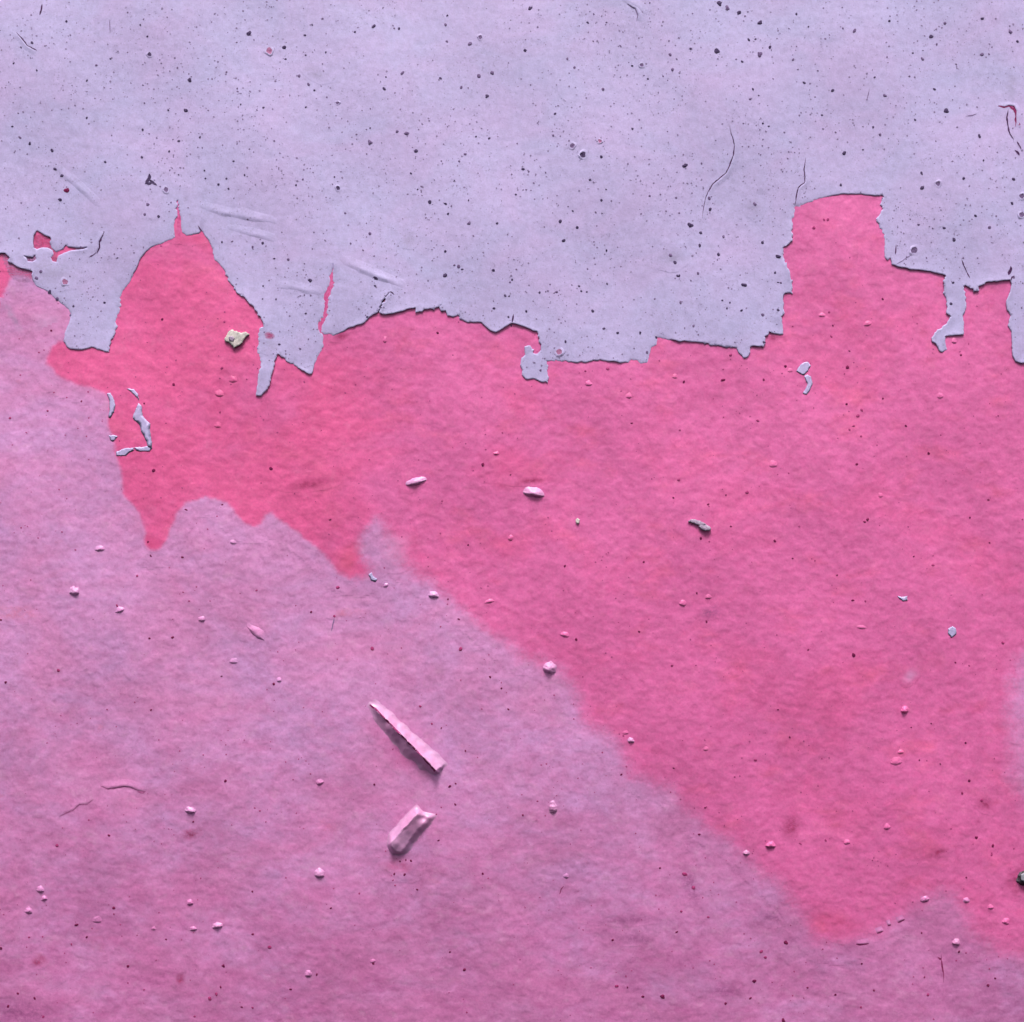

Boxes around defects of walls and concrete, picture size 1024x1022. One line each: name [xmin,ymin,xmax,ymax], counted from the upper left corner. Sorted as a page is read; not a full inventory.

crack [702,124,740,219]
crack [795,158,811,207]
peeling [0,231,85,326]
peeling [28,194,1024,974]